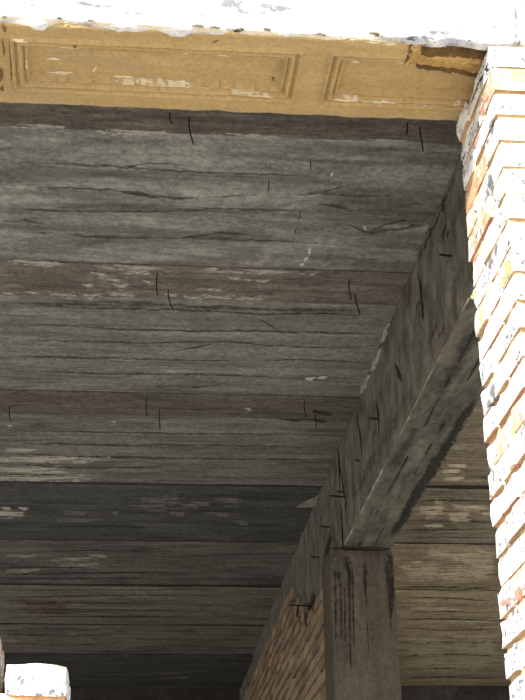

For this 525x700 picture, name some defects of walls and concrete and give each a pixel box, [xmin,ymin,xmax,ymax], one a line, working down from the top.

spalling [396,42,487,78]
peeling [114,75,193,88]
peeling [231,89,273,98]
peeling [334,94,396,105]
crack [5,186,378,242]